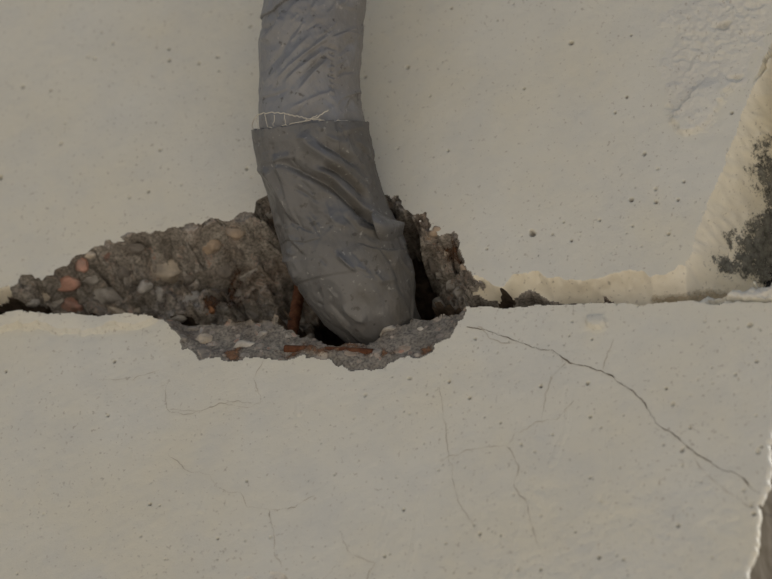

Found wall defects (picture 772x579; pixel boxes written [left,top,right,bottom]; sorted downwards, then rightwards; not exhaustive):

corrosion [287,285,304,335]
corrosion [284,342,394,359]
spalling [0,195,685,371]
leakage [712,135,772,287]
crack [439,326,754,546]